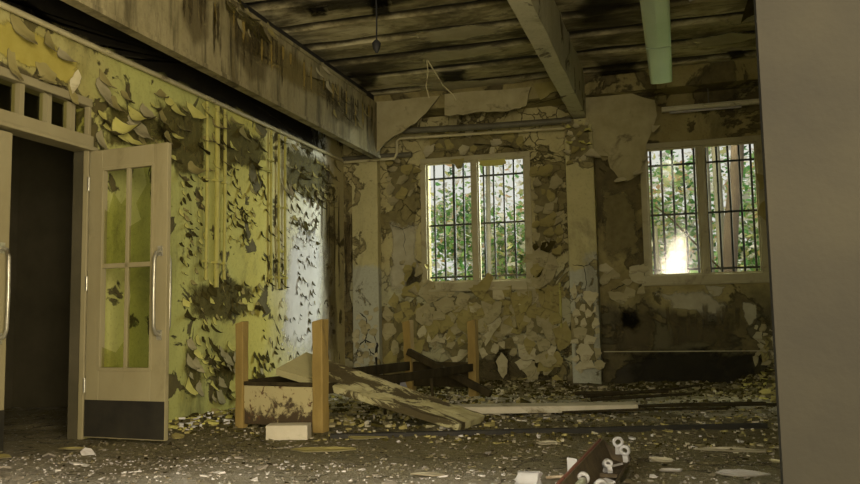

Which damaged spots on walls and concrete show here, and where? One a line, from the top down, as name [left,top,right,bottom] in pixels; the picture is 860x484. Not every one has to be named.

damp [293,0,412,16]
flaking render [693,0,756,48]
peeling [0,12,82,105]
damp [0,0,324,149]
damp [439,70,465,82]
damp [598,60,639,77]
peeling [423,129,524,170]
peeling [562,119,595,165]
peeling [96,68,341,404]
peeling [352,158,725,381]
flaking render [743,302,757,325]